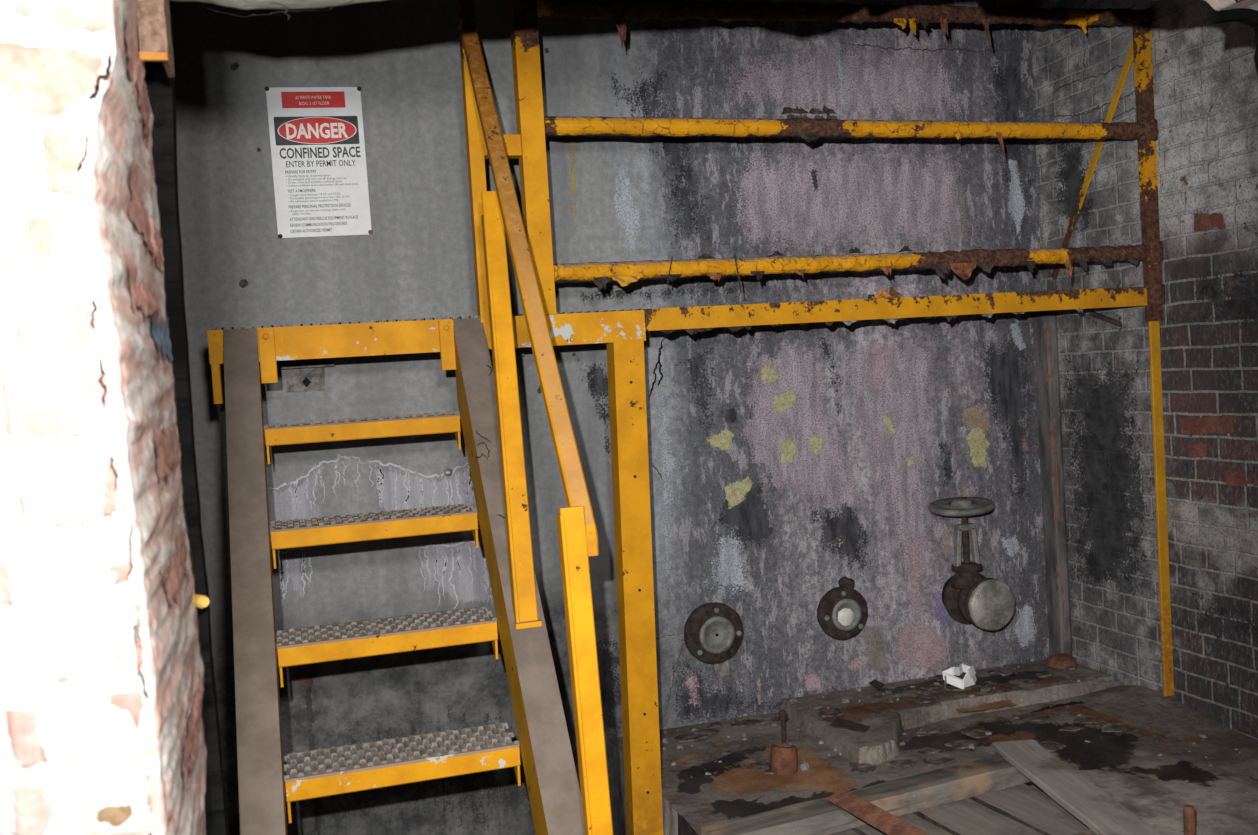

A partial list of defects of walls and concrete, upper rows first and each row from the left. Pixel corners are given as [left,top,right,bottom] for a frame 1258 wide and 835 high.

crack [88,51,112,98]
spalling [125,8,151,145]
peeling [0,39,103,194]
crack [77,135,88,176]
damp [649,135,978,257]
crack [90,297,107,407]
peeling [0,372,112,437]
peeling [102,457,117,515]
damp [267,454,475,522]
damp [419,538,493,609]
corrosion [710,742,855,795]
damp [900,721,1224,787]